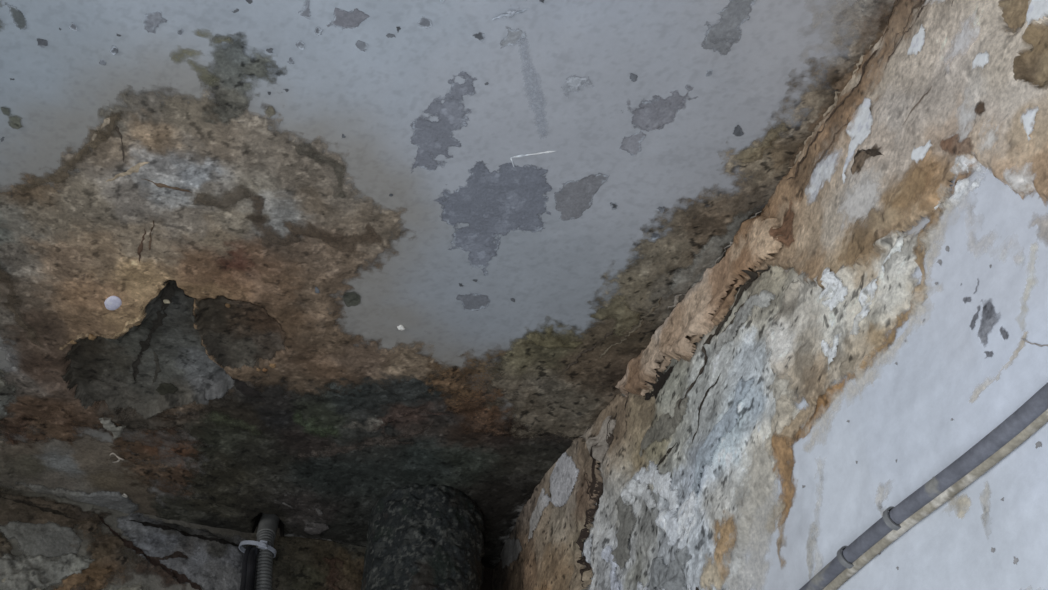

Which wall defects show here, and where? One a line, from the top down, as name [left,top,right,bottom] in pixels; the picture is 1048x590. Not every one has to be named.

crack [884,0,953,70]
spalling [59,280,286,439]
water stain [0,90,452,434]
peeling [411,71,489,171]
water stain [102,0,895,590]
peeling [436,161,608,311]
flaking render [492,0,1048,590]
water stain [766,232,930,404]
rust [765,134,976,566]
water stain [934,156,982,213]
water stain [963,279,1008,357]
flaking render [0,532,94,590]